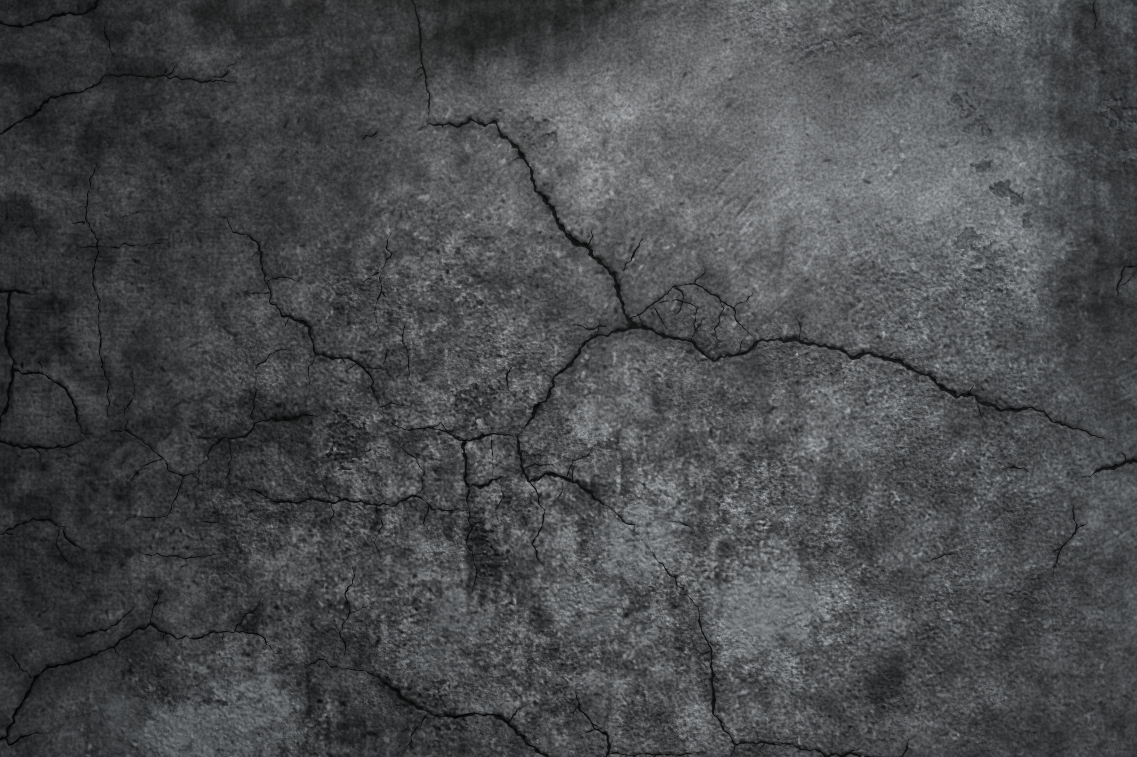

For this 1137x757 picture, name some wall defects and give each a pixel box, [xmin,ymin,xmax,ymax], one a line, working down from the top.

crack [0,0,247,135]
crack [412,0,430,118]
crack [72,160,170,415]
crack [1117,265,1137,303]
crack [0,289,101,464]
crack [106,118,1103,757]
crack [1083,453,1137,477]
crack [0,518,85,565]
crack [0,553,549,757]